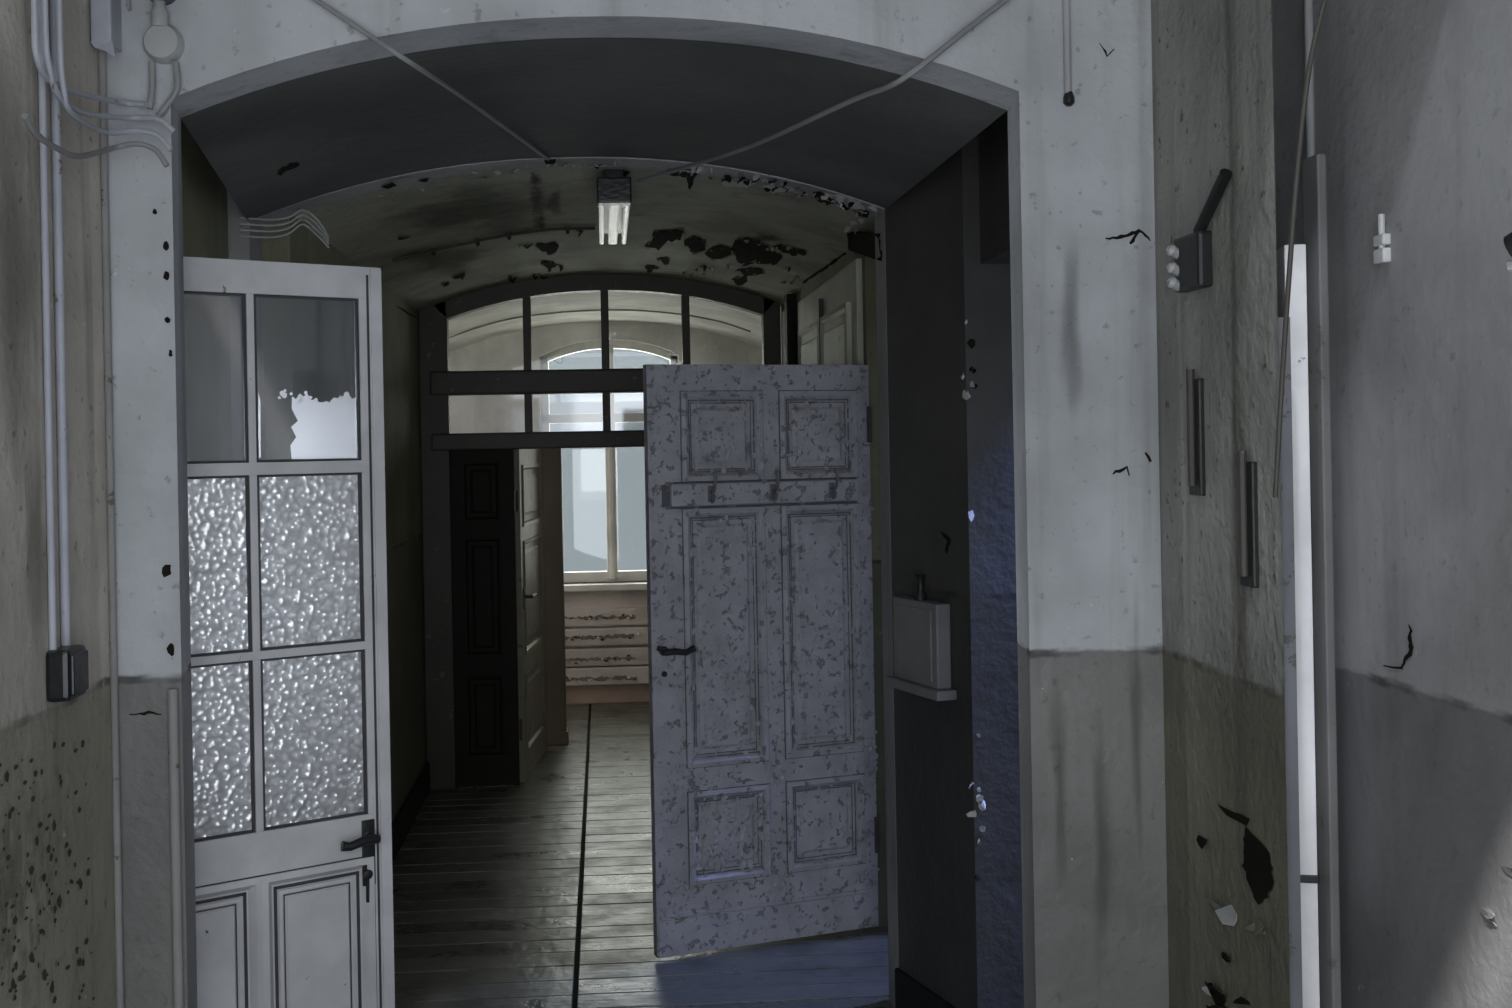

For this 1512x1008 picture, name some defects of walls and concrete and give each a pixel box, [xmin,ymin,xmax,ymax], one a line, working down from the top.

flaking render [643,227,807,287]
flaking render [669,166,882,261]
water stain [0,758,95,1008]
flaking render [1205,804,1274,935]
flaking render [1202,981,1250,1008]